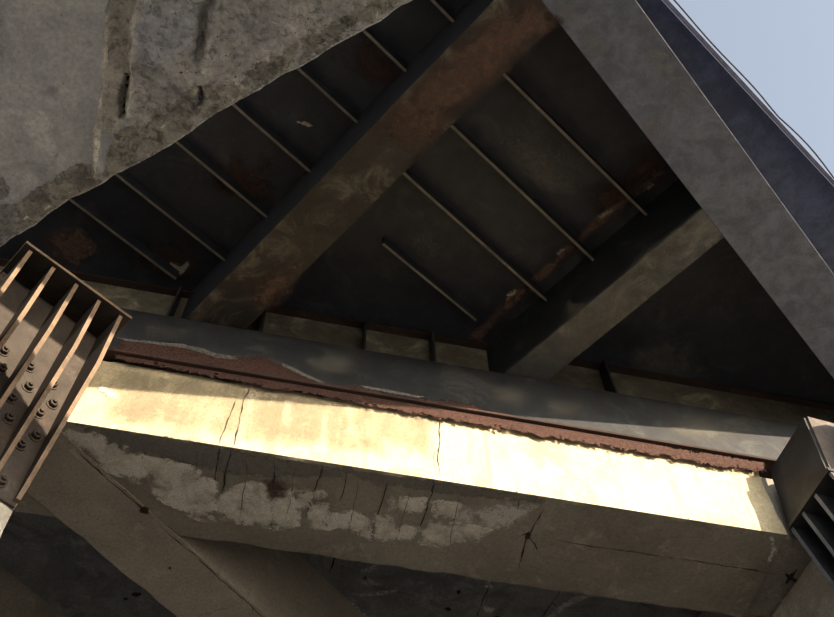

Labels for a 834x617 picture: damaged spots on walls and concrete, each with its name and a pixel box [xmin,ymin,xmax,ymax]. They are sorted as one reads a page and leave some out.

spalling [0,0,410,246]
crack [215,387,250,493]
water stain [62,424,546,548]
crack [371,480,389,537]
crack [413,422,441,541]
corrosion [114,339,767,473]
crack [515,502,783,575]